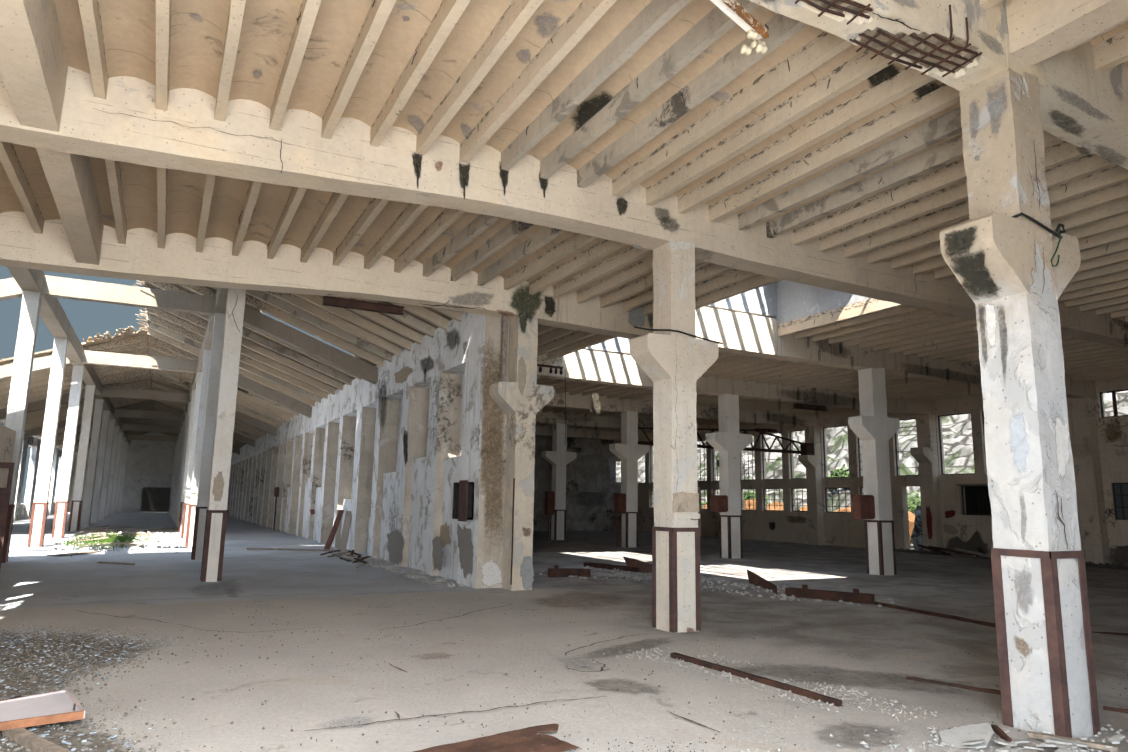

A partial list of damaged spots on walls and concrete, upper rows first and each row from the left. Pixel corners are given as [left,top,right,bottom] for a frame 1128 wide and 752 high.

spalling [795,0,1003,77]
crack [93,108,290,173]
peeling [395,366,413,383]
damp [481,348,504,531]
peeling [387,530,405,564]
peeling [432,478,515,587]